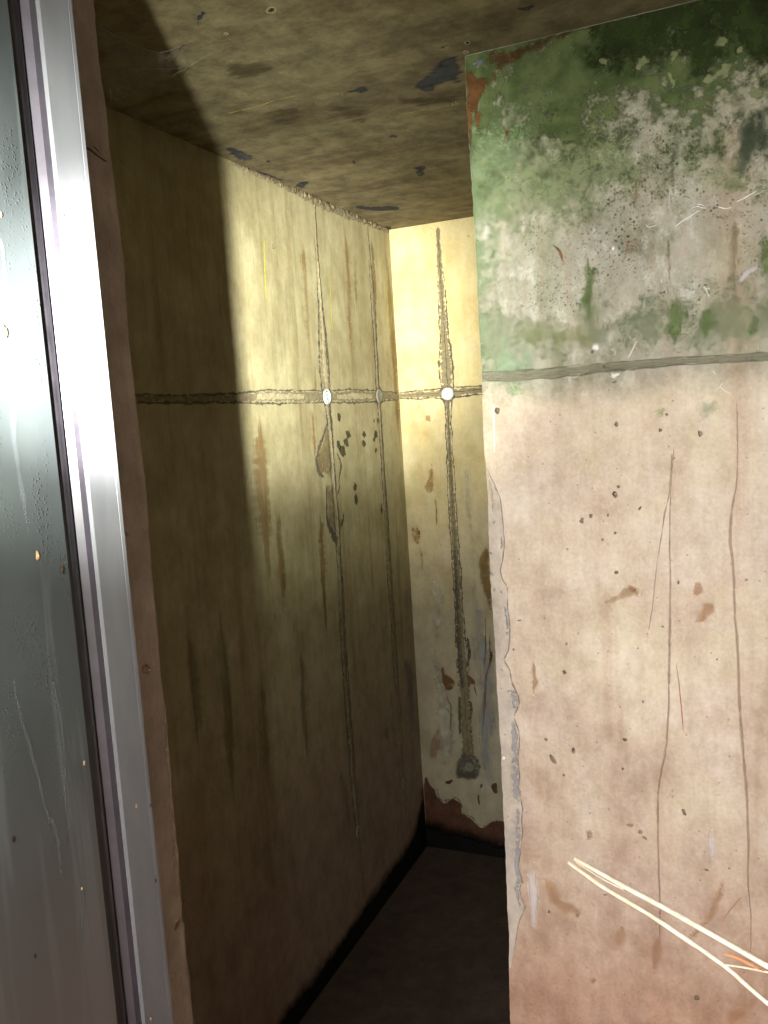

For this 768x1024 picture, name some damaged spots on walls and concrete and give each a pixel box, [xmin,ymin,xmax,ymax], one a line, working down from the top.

corrosion [466,31,570,144]
leakage [576,125,727,278]
spalling [424,465,527,968]